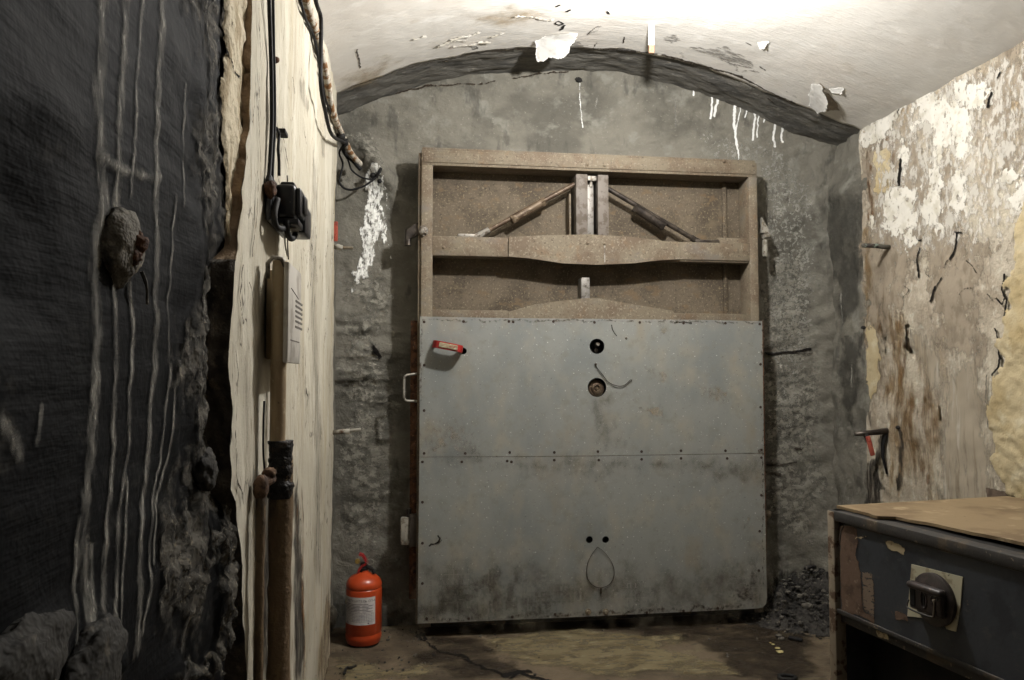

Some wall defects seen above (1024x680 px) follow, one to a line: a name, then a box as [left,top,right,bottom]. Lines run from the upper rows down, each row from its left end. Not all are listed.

peeling [535,26,601,62]
peeling [692,46,757,72]
peeling [808,83,844,114]
water stain [968,43,1024,174]
efflorescence [351,163,392,293]
water stain [697,97,1001,543]
peeling [859,49,1024,499]
water stain [336,408,391,558]